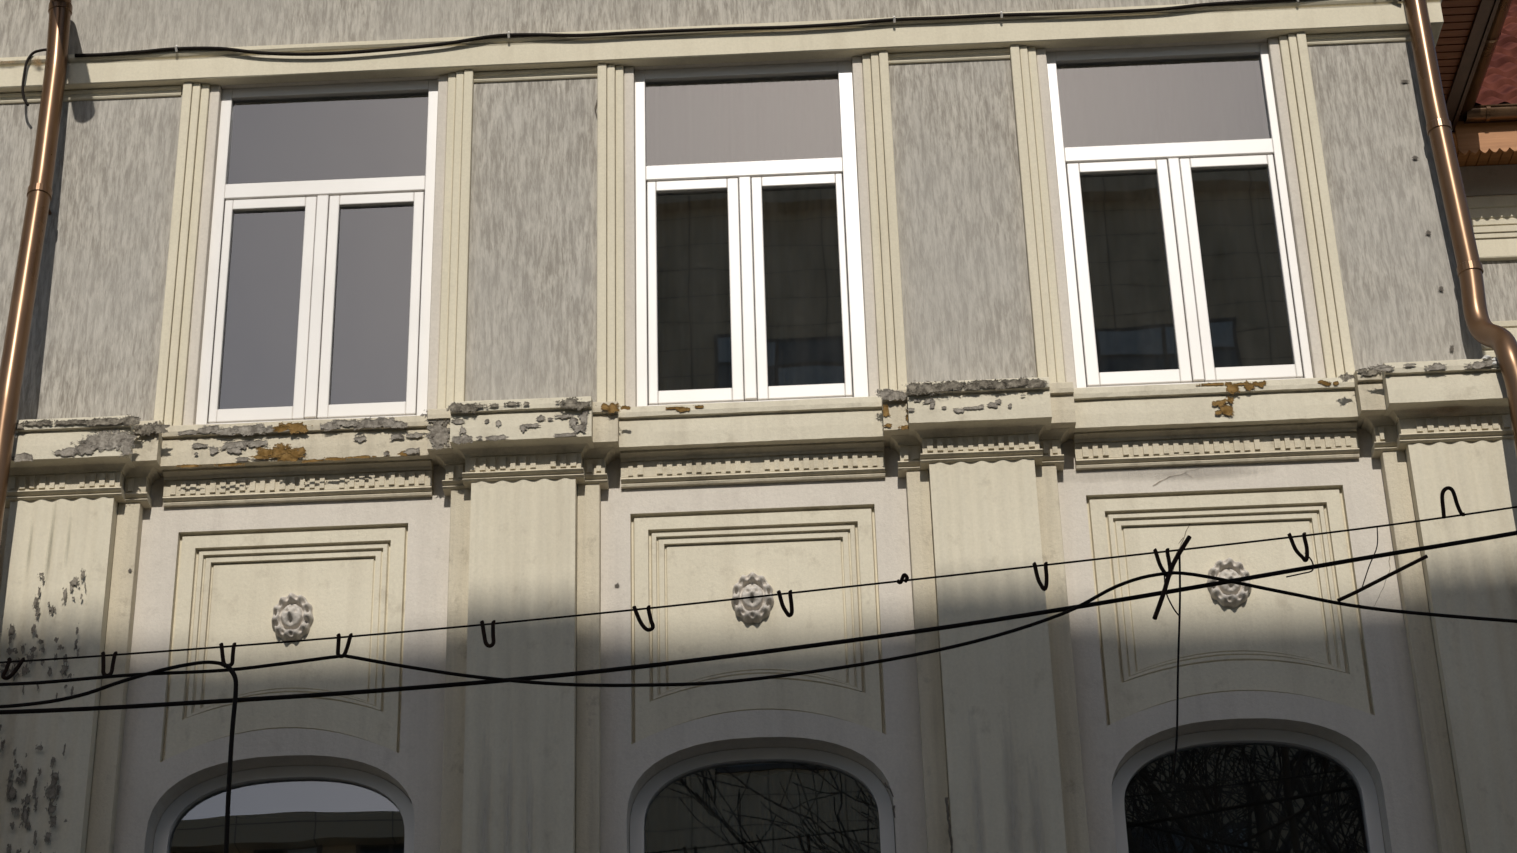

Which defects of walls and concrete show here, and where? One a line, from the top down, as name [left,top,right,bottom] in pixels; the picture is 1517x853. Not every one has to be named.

spalling [876,377,1048,413]
corrosion [1196,380,1268,416]
peeling [12,452,34,463]
peeling [16,414,289,468]
corrosion [248,421,313,461]
peeling [301,396,630,463]
peeling [0,569,86,699]
peeling [0,724,67,853]